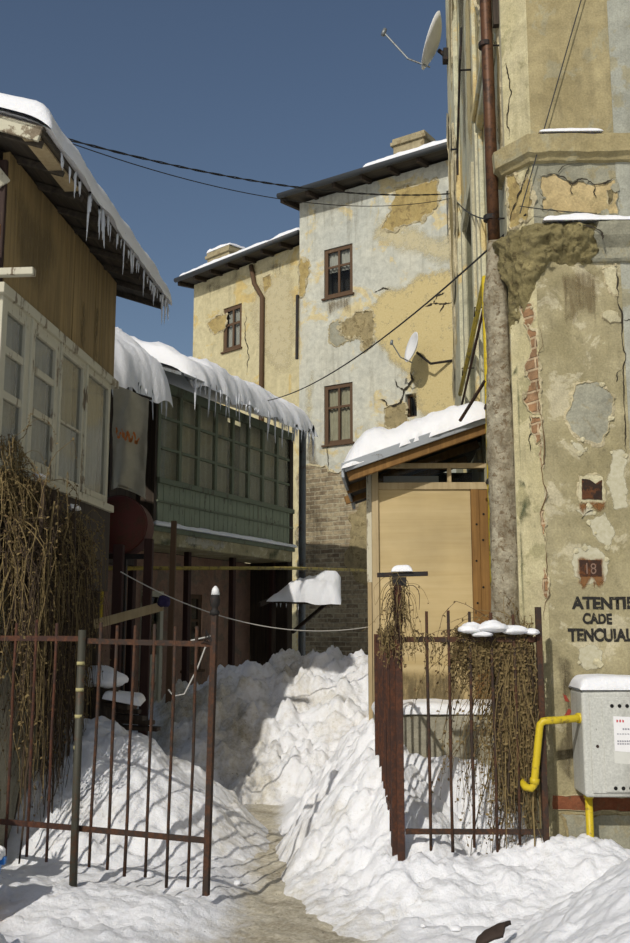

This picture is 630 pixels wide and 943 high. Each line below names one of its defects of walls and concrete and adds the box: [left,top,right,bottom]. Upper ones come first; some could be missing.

crack [505,65,513,131]
peeling [327,114,458,429]
peeling [500,171,620,231]
flaking render [519,301,545,469]
flaking render [294,463,368,656]
spalling [563,380,628,584]